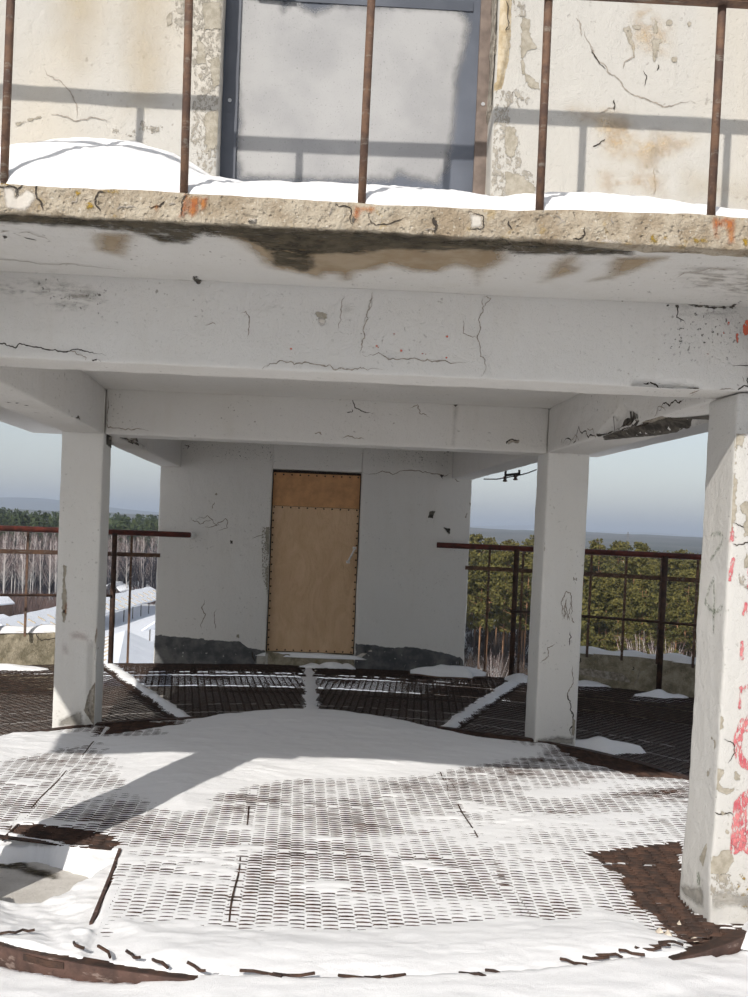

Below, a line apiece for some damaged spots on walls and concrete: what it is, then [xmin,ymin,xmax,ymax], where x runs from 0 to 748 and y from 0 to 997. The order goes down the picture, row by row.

peeling [166,0,222,173]
peeling [491,0,540,196]
rust [180,193,206,216]
damp [0,215,655,276]
rust [714,219,734,242]
crack [0,343,106,361]
crack [262,292,491,372]
crack [315,400,370,439]
spalling [596,411,709,440]
peeling [731,434,748,589]